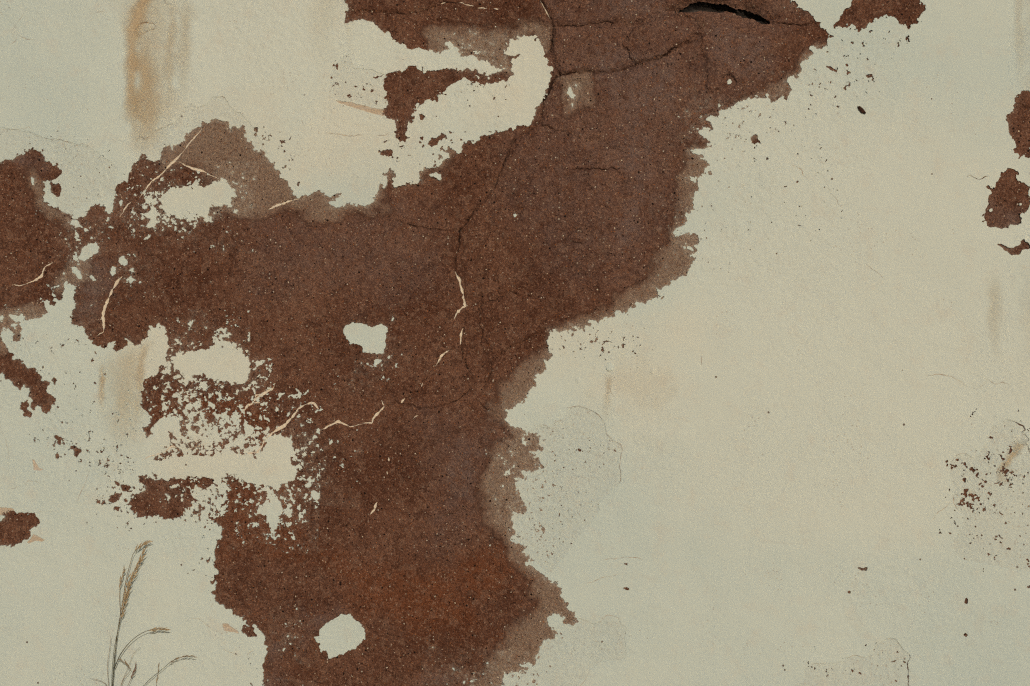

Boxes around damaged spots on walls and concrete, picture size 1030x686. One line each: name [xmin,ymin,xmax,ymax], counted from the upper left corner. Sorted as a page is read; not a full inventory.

peeling [833,0,926,47]
peeling [826,55,875,108]
peeling [419,131,454,148]
peeling [982,91,1030,229]
crack [248,0,693,474]
peeling [997,239,1030,255]
peeling [53,435,89,471]
peeling [96,472,220,522]
peeling [0,510,40,547]